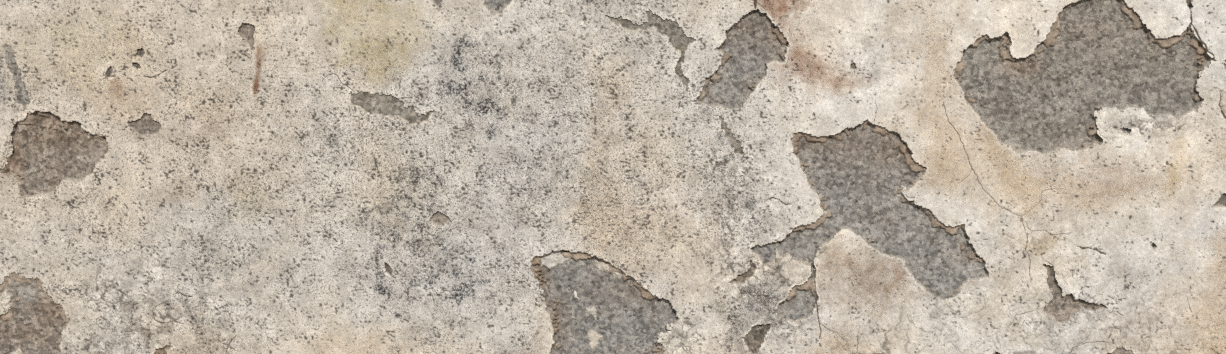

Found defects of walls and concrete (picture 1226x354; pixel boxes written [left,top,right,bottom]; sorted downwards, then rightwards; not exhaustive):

spalling [0,44,108,198]
peeling [351,91,435,127]
spalling [605,0,789,155]
spalling [953,0,1226,154]
spalling [0,271,69,354]
spalling [531,249,679,354]
spalling [730,119,989,354]
spalling [1043,264,1108,323]